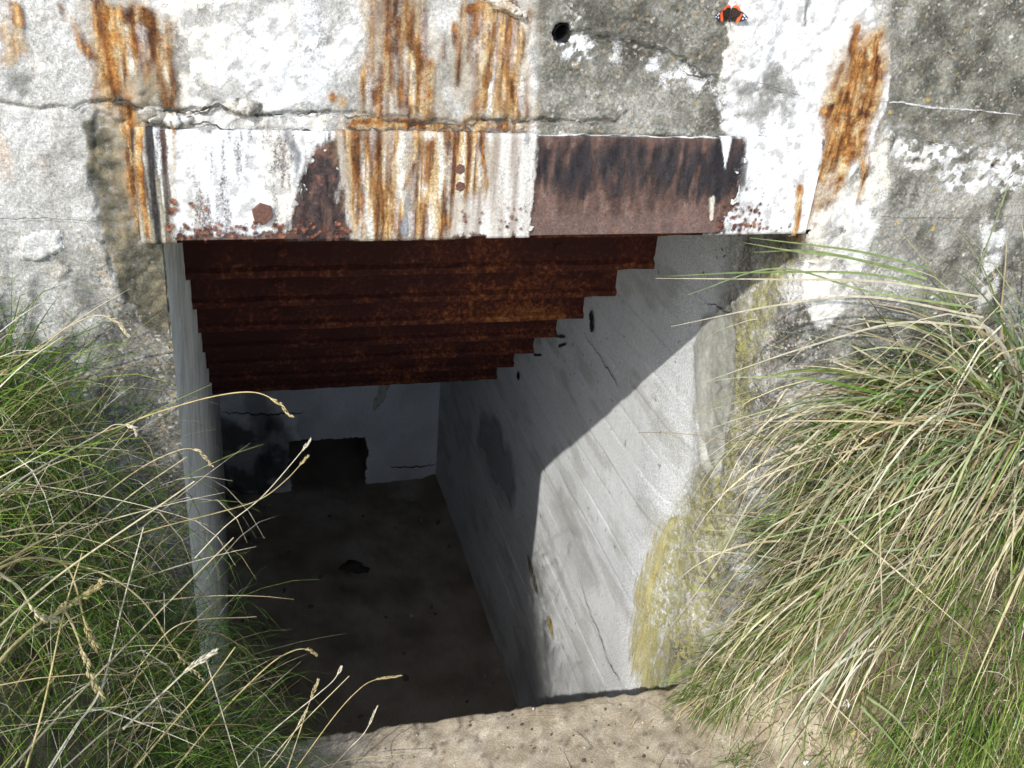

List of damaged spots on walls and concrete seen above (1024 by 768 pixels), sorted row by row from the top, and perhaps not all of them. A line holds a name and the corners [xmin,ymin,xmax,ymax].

damp [82,116,170,333]
crack [54,96,233,130]
peeling [146,0,390,240]
rust [58,0,529,244]
crack [254,110,610,133]
peeling [441,132,539,239]
rust [716,23,887,243]